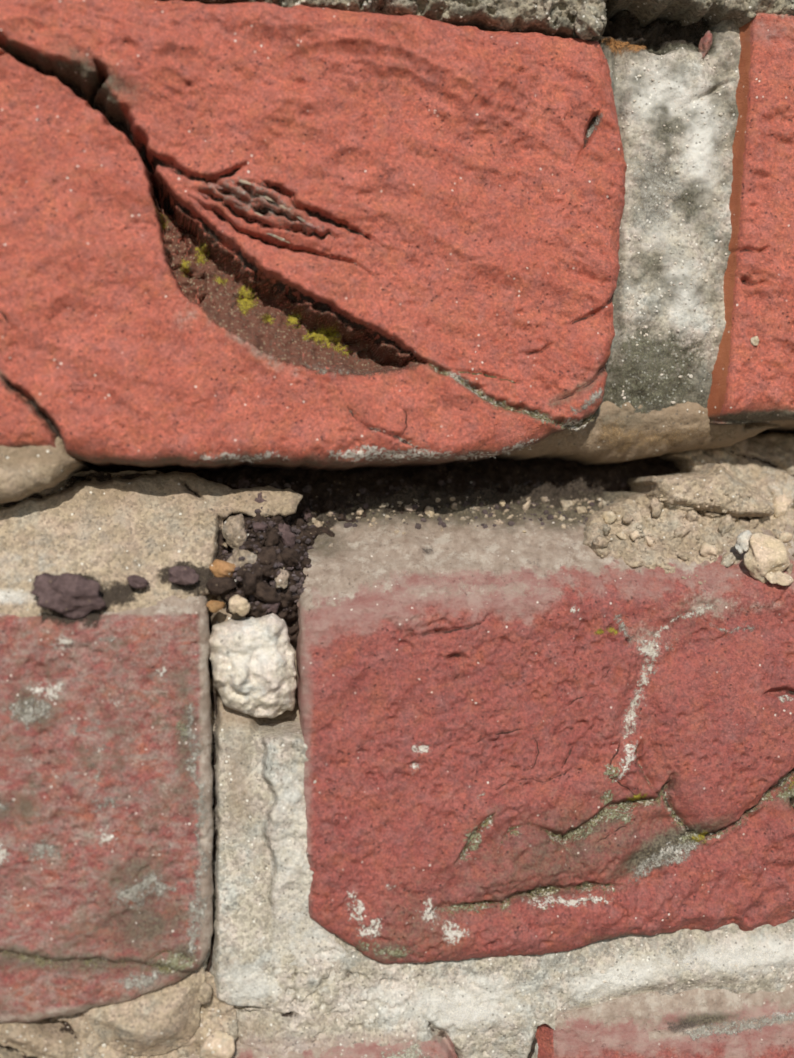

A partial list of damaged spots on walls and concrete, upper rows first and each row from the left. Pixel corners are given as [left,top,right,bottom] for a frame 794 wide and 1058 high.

spalling [146,169,425,376]
crack [7,52,606,430]
crack [572,296,613,324]
crack [2,377,60,439]
crack [460,729,572,861]
crack [545,747,794,852]
crack [442,882,615,915]